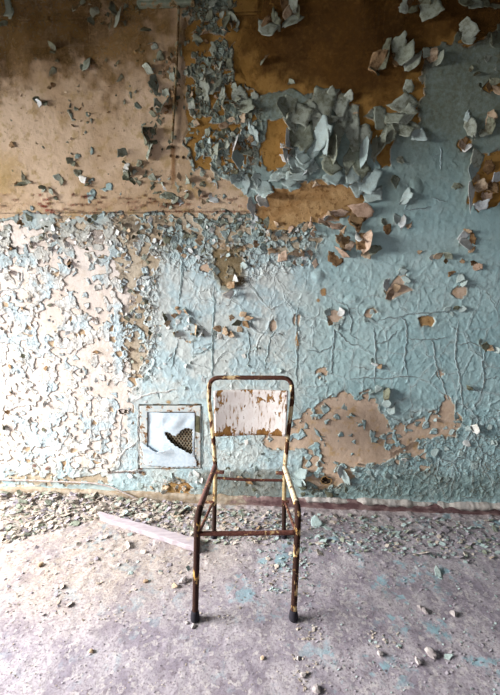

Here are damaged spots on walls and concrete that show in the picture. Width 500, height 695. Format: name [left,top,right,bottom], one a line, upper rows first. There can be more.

peeling [0,0,500,487]
peeling [128,470,207,495]
crack [247,330,276,365]
peeling [222,385,500,511]
crack [295,304,496,468]